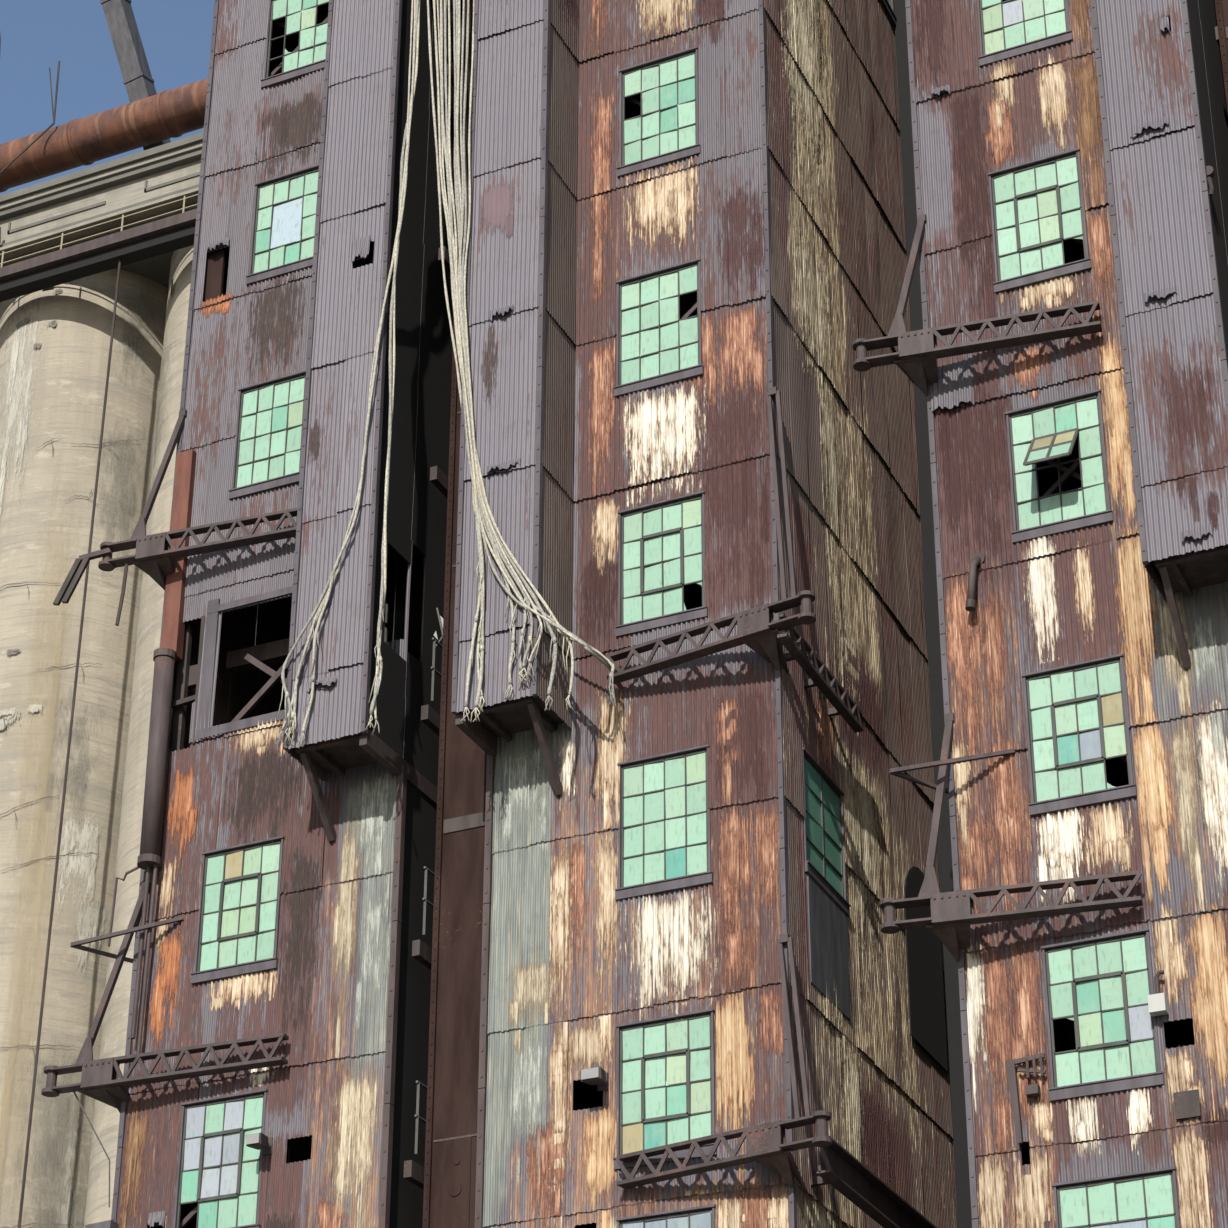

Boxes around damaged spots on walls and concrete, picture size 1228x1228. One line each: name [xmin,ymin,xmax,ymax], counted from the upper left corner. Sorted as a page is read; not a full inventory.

peeling [636,0,695,49]
corrosion [198,273,305,384]
corrosion [587,328,616,507]
spalling [0,704,42,730]
corrosion [166,765,197,867]
corrosion [703,680,784,1057]
peeling [1022,332,1228,1228]
corrosion [149,927,184,1047]
peeling [508,689,759,1228]